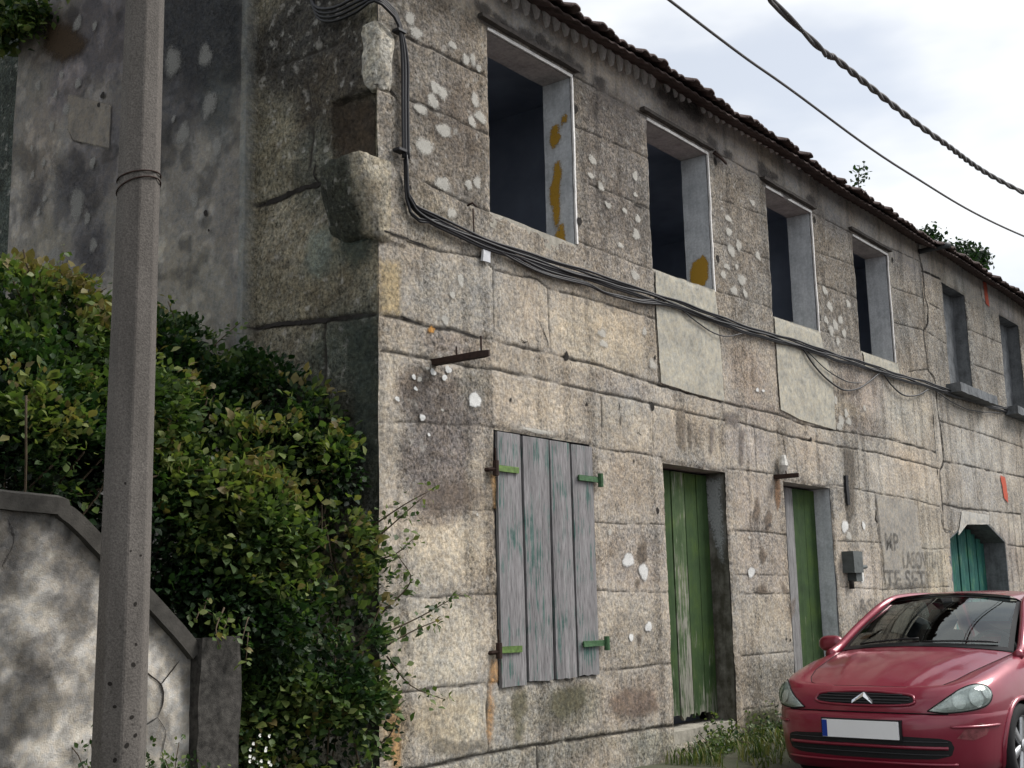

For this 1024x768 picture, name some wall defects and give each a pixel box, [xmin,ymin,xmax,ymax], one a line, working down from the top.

crack [147,659,181,768]